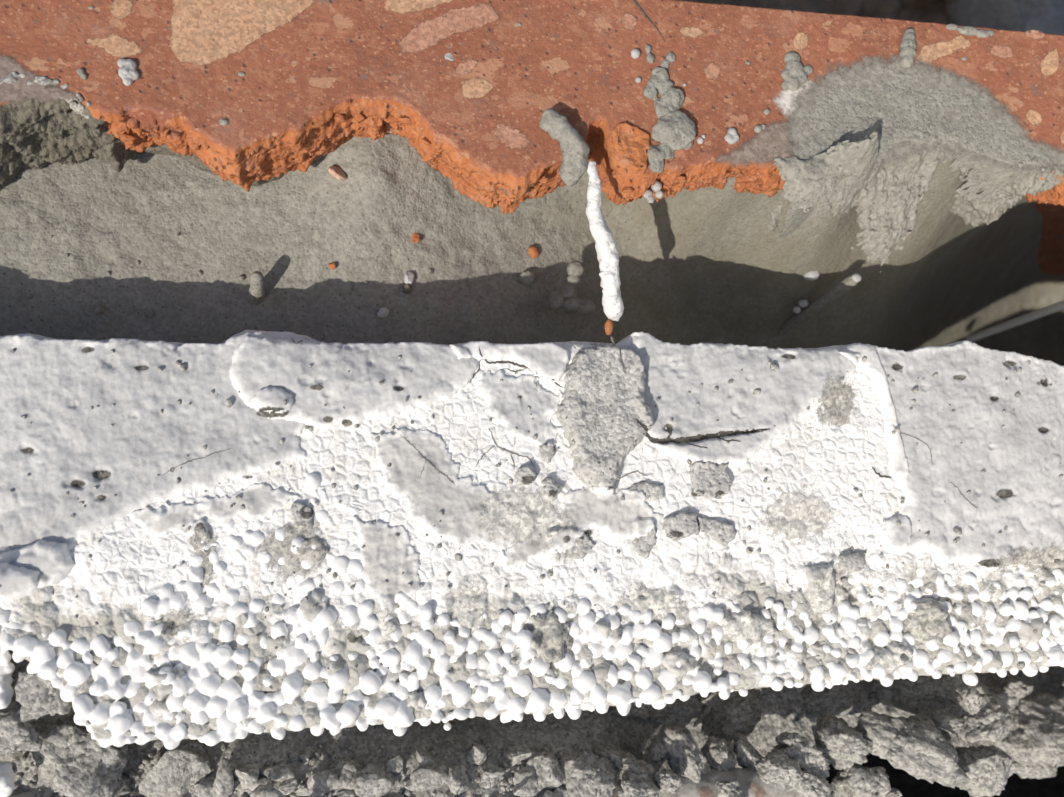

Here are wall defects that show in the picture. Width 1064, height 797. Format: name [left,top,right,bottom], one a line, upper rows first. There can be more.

spalling [110,115,275,188]
spalling [300,113,442,169]
spalling [465,170,549,208]
spalling [599,121,652,202]
spalling [660,168,780,200]
crack [635,418,768,448]
water stain [476,484,575,548]
water stain [760,485,833,544]
water stain [258,517,331,582]
water stain [526,601,573,666]
water stain [707,602,777,649]
water stain [864,543,1064,675]